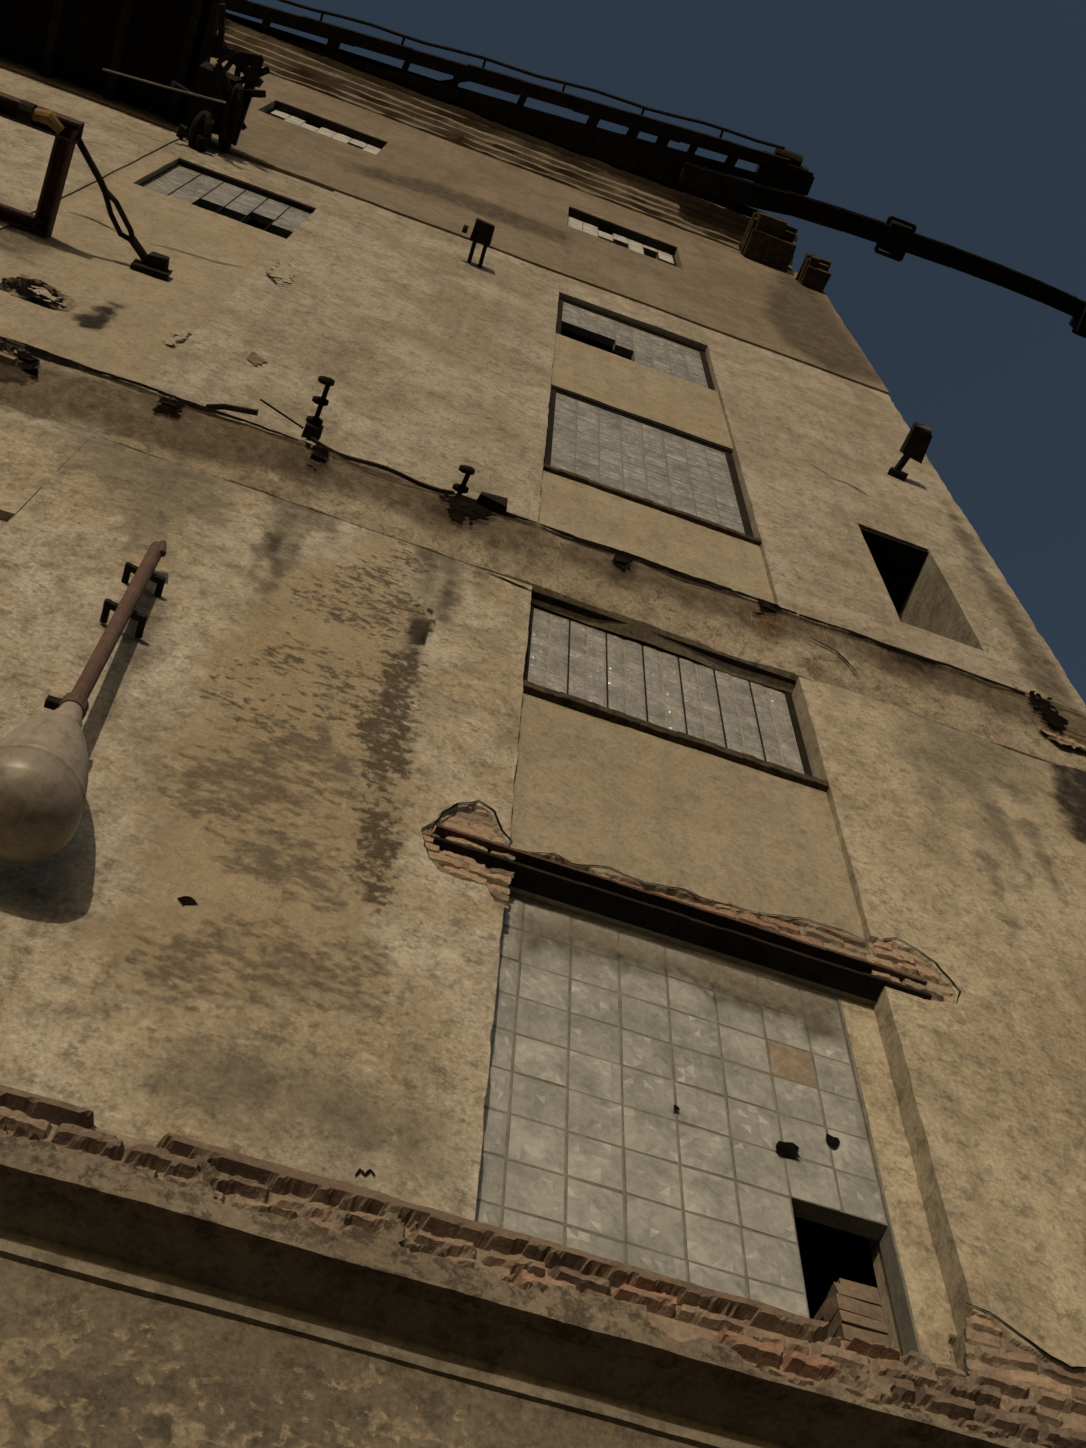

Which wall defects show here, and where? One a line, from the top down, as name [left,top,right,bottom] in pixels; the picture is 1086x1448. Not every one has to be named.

peeling [28,286,66,305]
peeling [0,341,38,381]
flaking render [1013,683,1086,751]
flaking render [533,854,953,1002]
flaking render [0,1084,1086,1448]